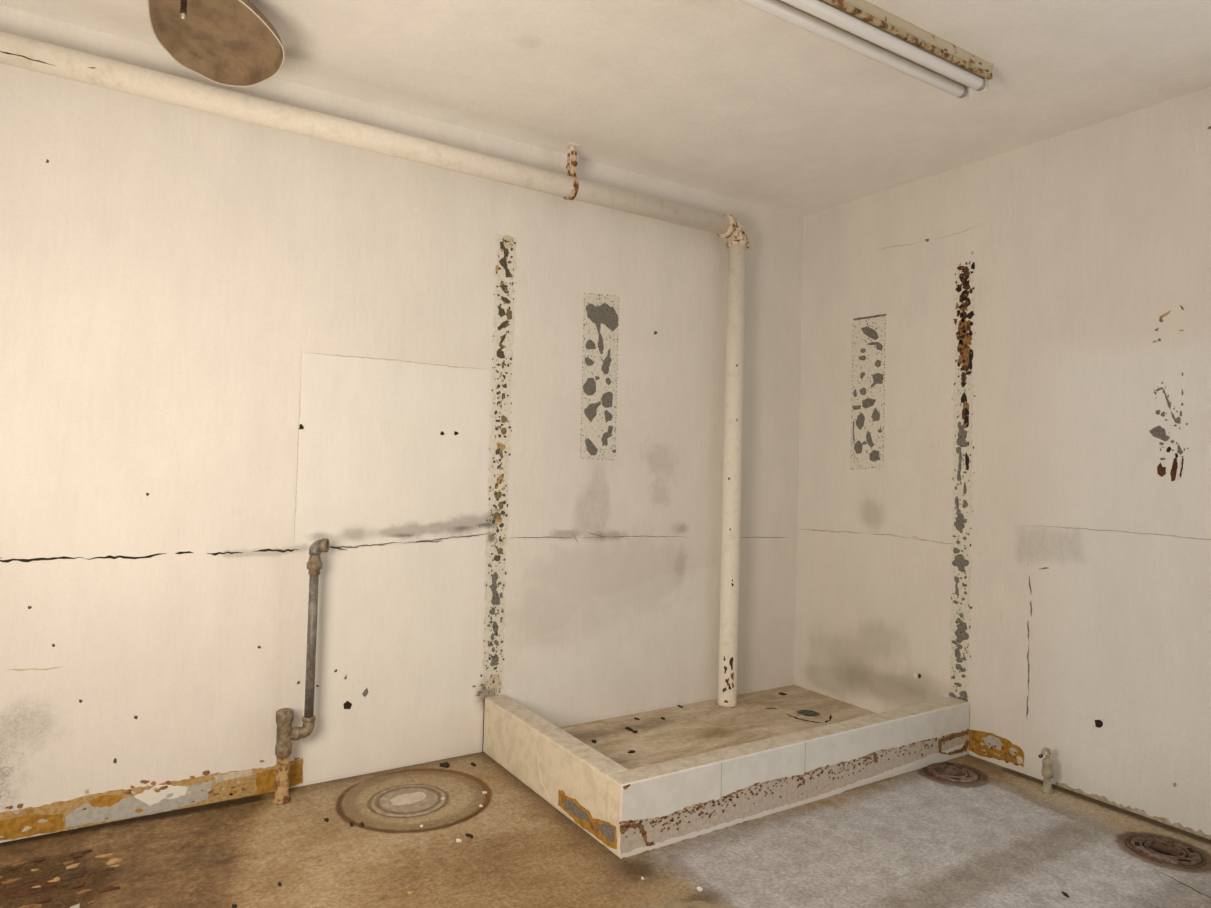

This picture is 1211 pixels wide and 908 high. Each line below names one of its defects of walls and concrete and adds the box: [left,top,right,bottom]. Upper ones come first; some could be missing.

peeling [472,234,518,702]
peeling [1149,372,1189,482]
crack [0,549,299,563]
crack [329,532,682,550]
crack [1026,565,1047,717]
peeling [134,784,188,806]